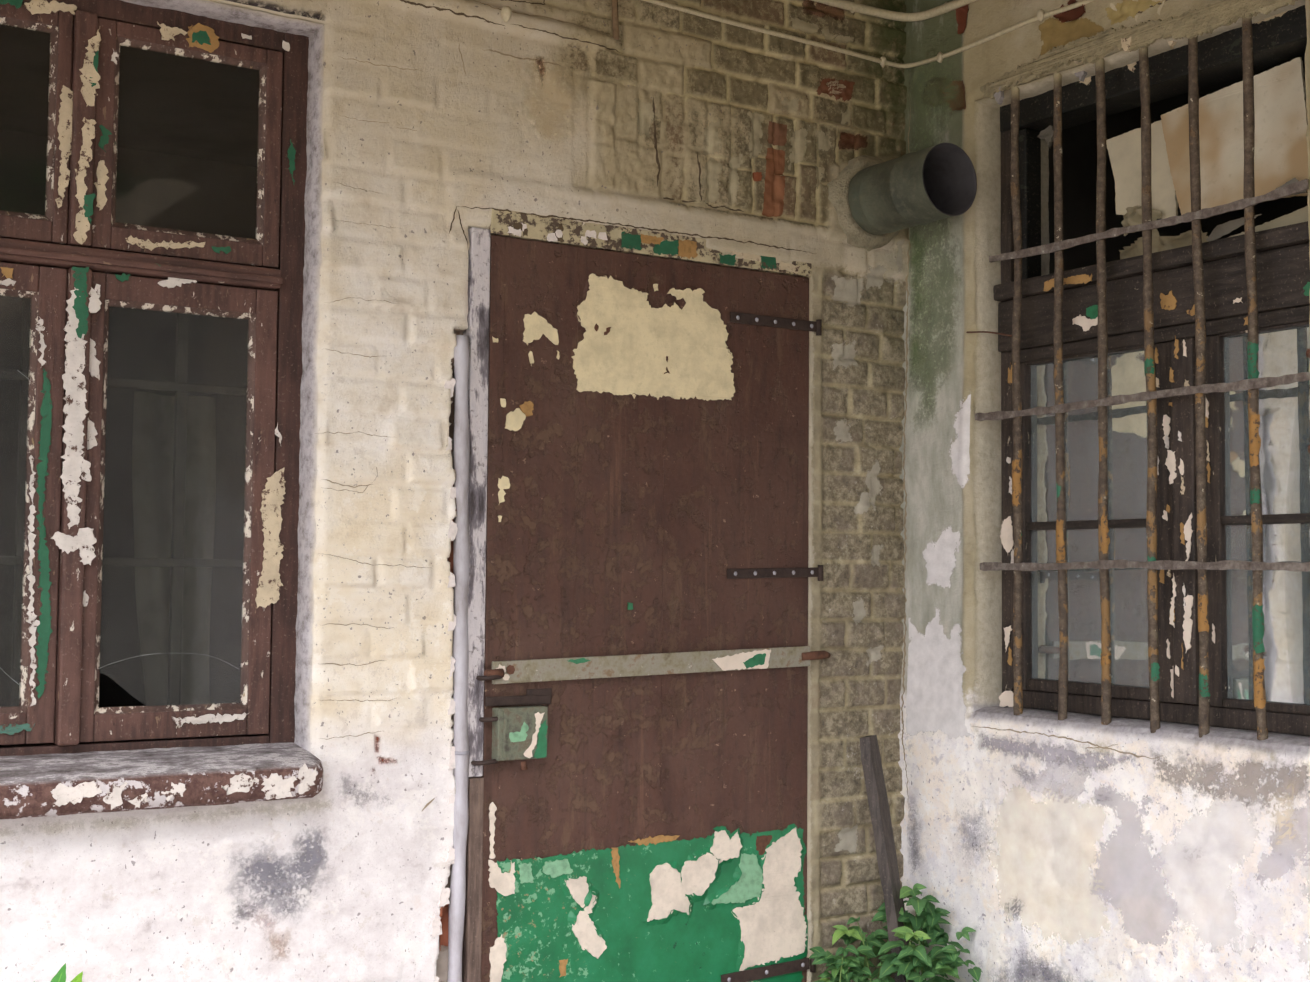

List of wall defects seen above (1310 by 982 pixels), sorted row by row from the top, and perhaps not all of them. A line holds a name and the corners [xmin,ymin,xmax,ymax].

crack [400,0,623,74]
peeling [790,0,854,48]
spalling [955,4,969,34]
crack [449,97,813,254]
peeling [702,77,868,217]
peeling [949,393,971,488]
peeling [922,525,961,589]
peeling [906,608,970,739]
peeling [999,691,1014,707]
peeling [1004,625,1013,666]
peeling [1252,604,1266,709]
water stain [242,833,326,911]